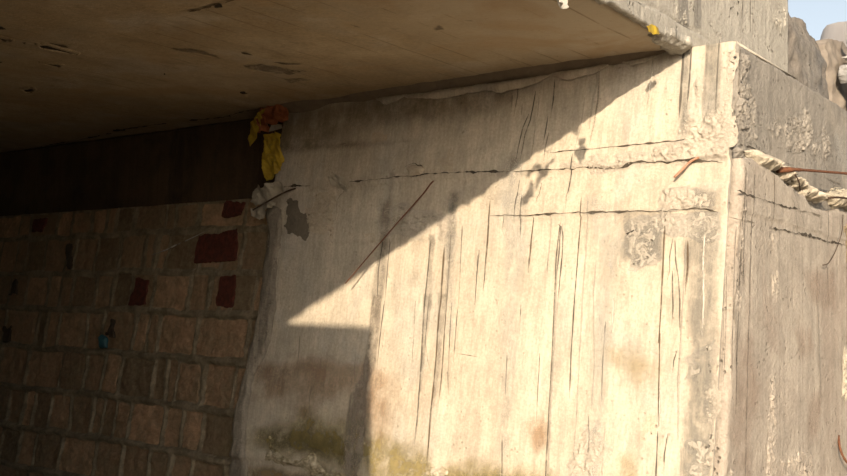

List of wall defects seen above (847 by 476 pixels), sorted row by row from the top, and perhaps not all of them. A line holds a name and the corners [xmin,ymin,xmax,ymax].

crack [189,0,234,12]
crack [350,138,722,182]
spalling [284,198,310,241]
crack [491,207,754,223]
crack [737,190,842,245]
damp [475,204,490,296]
damp [345,241,390,476]
damp [412,235,458,450]
spalling [265,435,346,476]